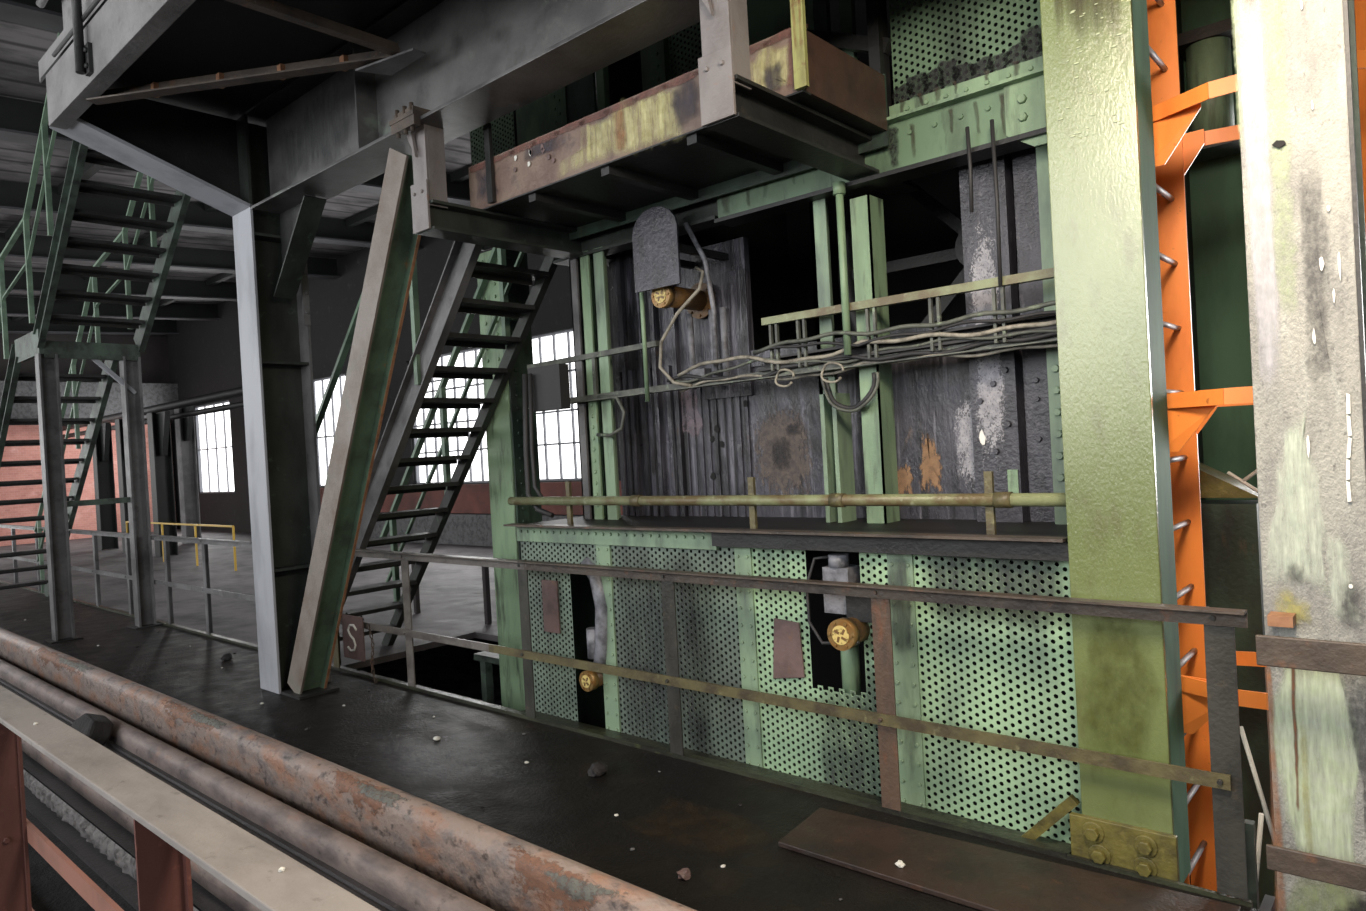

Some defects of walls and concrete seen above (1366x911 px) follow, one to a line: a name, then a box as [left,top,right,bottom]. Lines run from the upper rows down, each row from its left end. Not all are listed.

corrosion [470,70,698,196]
corrosion [749,28,793,90]
water stain [1242,0,1291,367]
water stain [1306,207,1327,357]
corrosion [897,433,942,494]
water stain [1271,422,1355,617]
water stain [1274,668,1366,862]